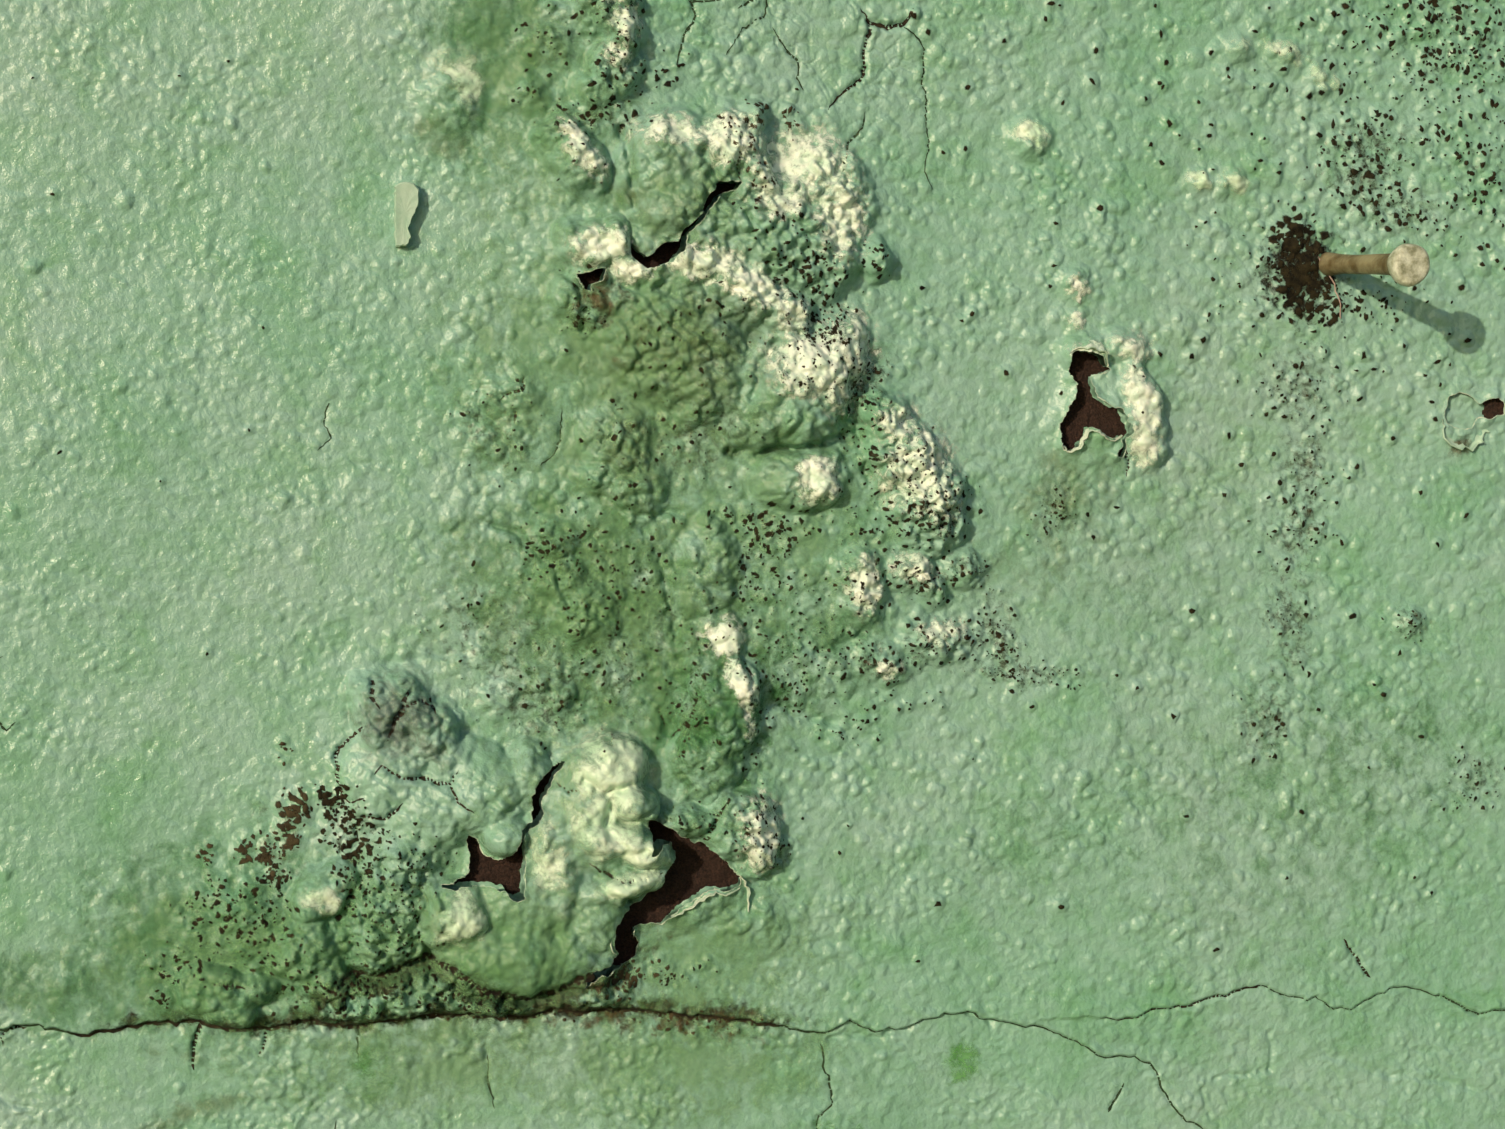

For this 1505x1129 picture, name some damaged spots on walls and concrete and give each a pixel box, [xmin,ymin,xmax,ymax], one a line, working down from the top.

peeling [1059,347,1134,458]
peeling [441,761,565,903]
peeling [585,819,751,988]
crack [0,939,1505,1129]